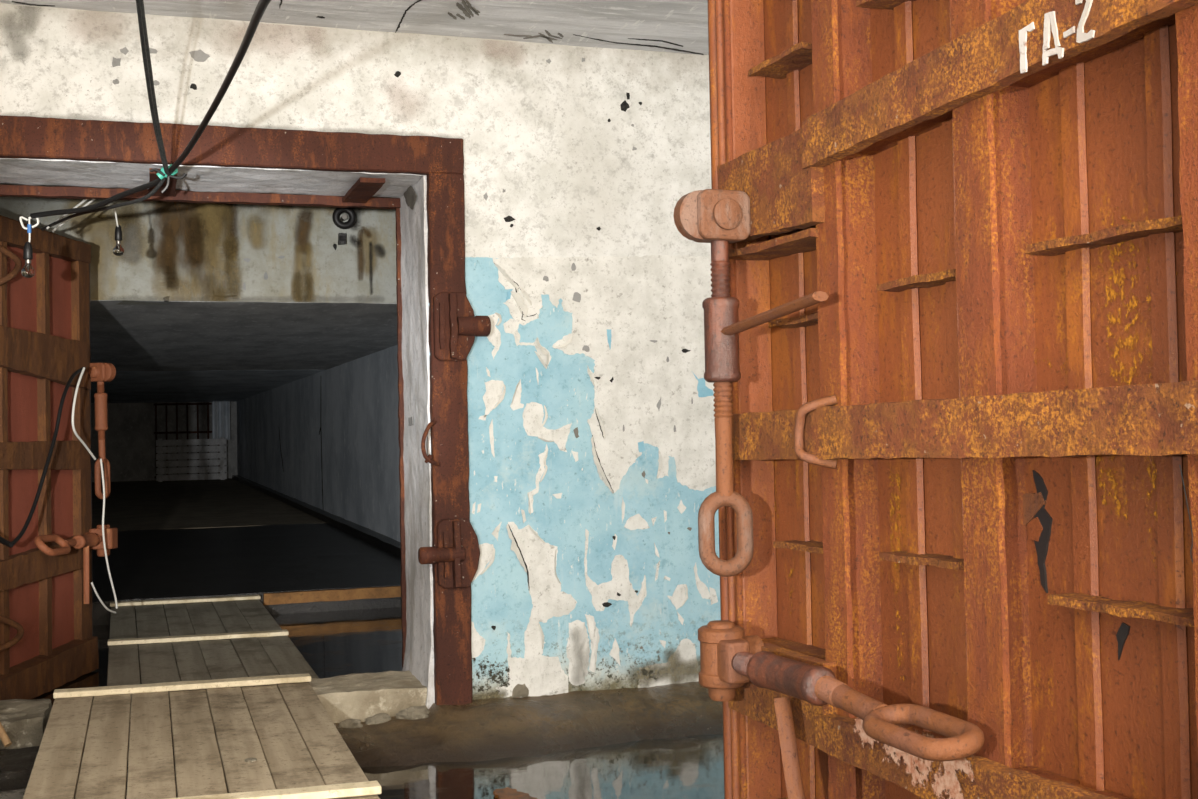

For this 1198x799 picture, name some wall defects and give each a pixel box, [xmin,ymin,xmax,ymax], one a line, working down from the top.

water stain [70,201,140,300]
rust [154,189,240,300]
water stain [250,205,288,246]
rust [293,210,313,302]
rust [358,228,375,294]
rust [1097,240,1152,387]
peeling [471,255,718,698]
mould [472,658,510,700]
water stain [632,651,701,684]
peeling [853,717,975,799]